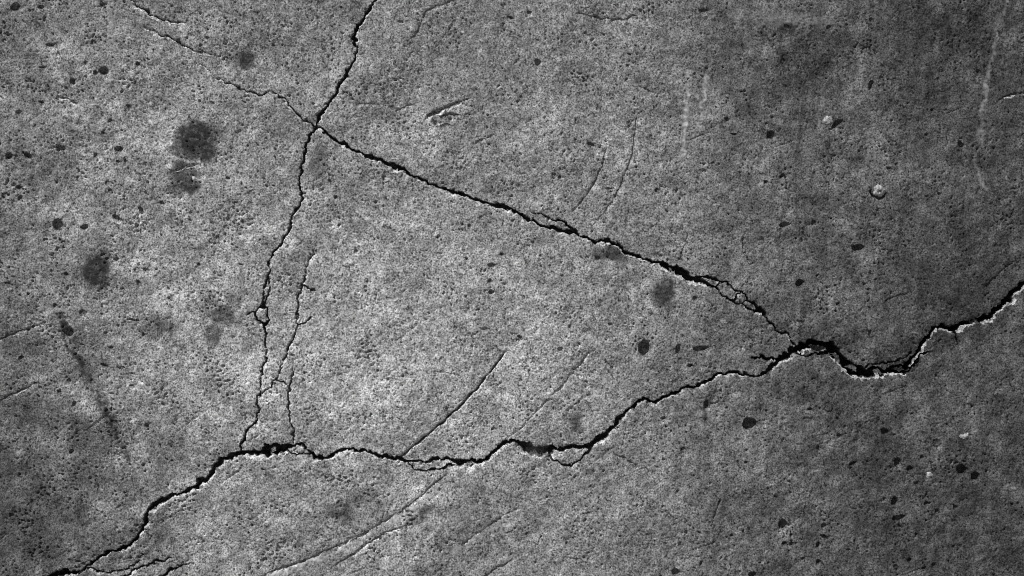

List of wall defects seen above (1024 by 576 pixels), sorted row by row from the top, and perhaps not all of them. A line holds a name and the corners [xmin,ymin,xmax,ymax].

crack [129,0,186,26]
crack [142,27,213,56]
crack [215,78,268,96]
crack [247,0,796,388]
crack [47,281,1024,576]